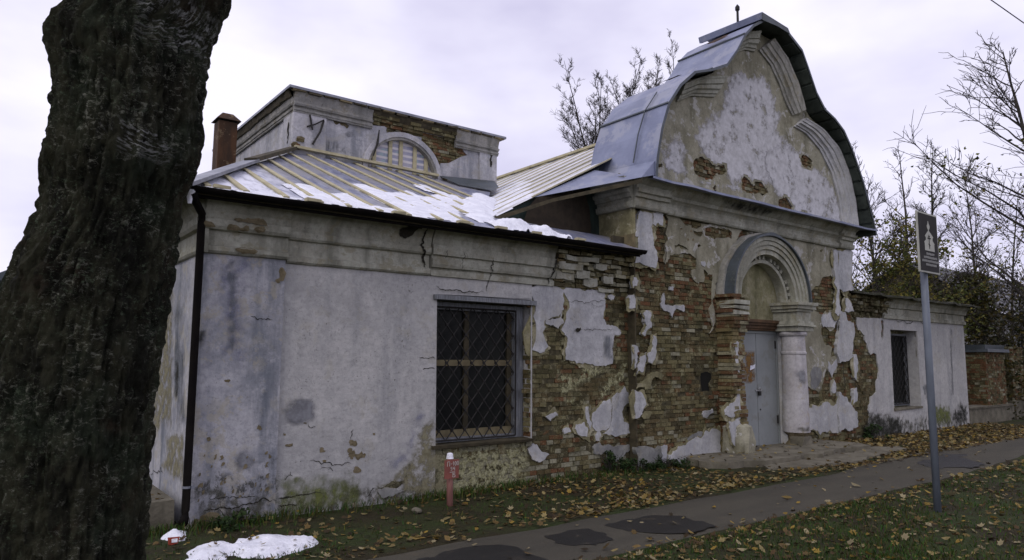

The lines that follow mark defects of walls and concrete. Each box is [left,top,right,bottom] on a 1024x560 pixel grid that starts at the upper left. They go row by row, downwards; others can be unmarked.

peeling [658,72,841,221]
spalling [227,218,267,233]
crack [420,229,494,293]
flaking render [378,209,750,499]
flaking render [808,248,883,442]
crack [204,430,353,521]
water stain [286,399,314,424]
peeling [347,440,366,473]